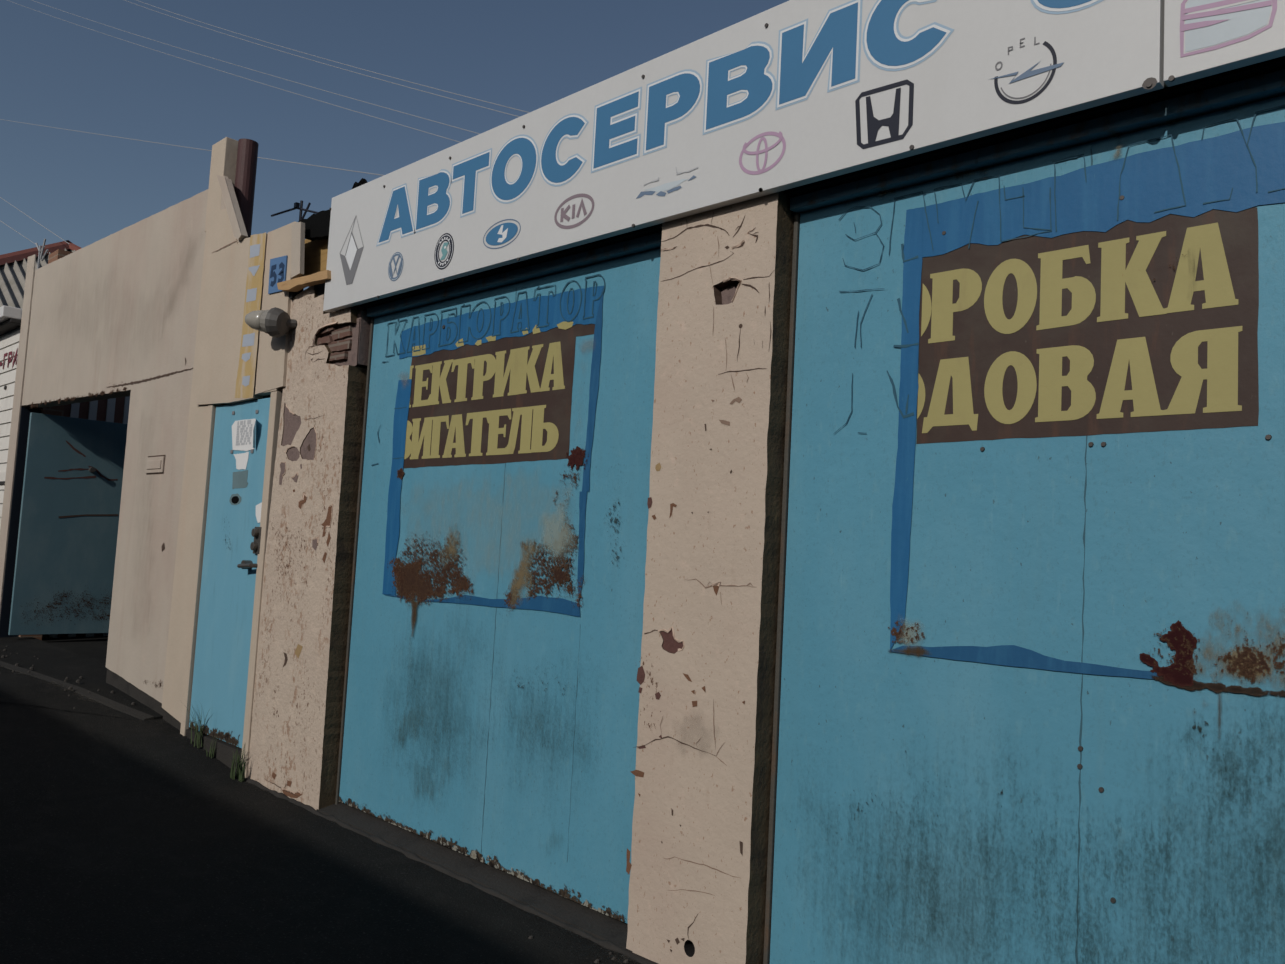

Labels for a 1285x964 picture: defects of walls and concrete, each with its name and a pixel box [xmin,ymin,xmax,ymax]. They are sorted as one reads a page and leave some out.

spalling [312,318,360,366]
spalling [713,277,742,305]
peeling [271,403,333,600]
corrosion [504,446,589,609]
corrosion [387,527,474,636]
peeling [644,626,685,654]
corrosion [888,622,926,656]
corrosion [1139,620,1285,725]
corrosion [339,796,625,922]